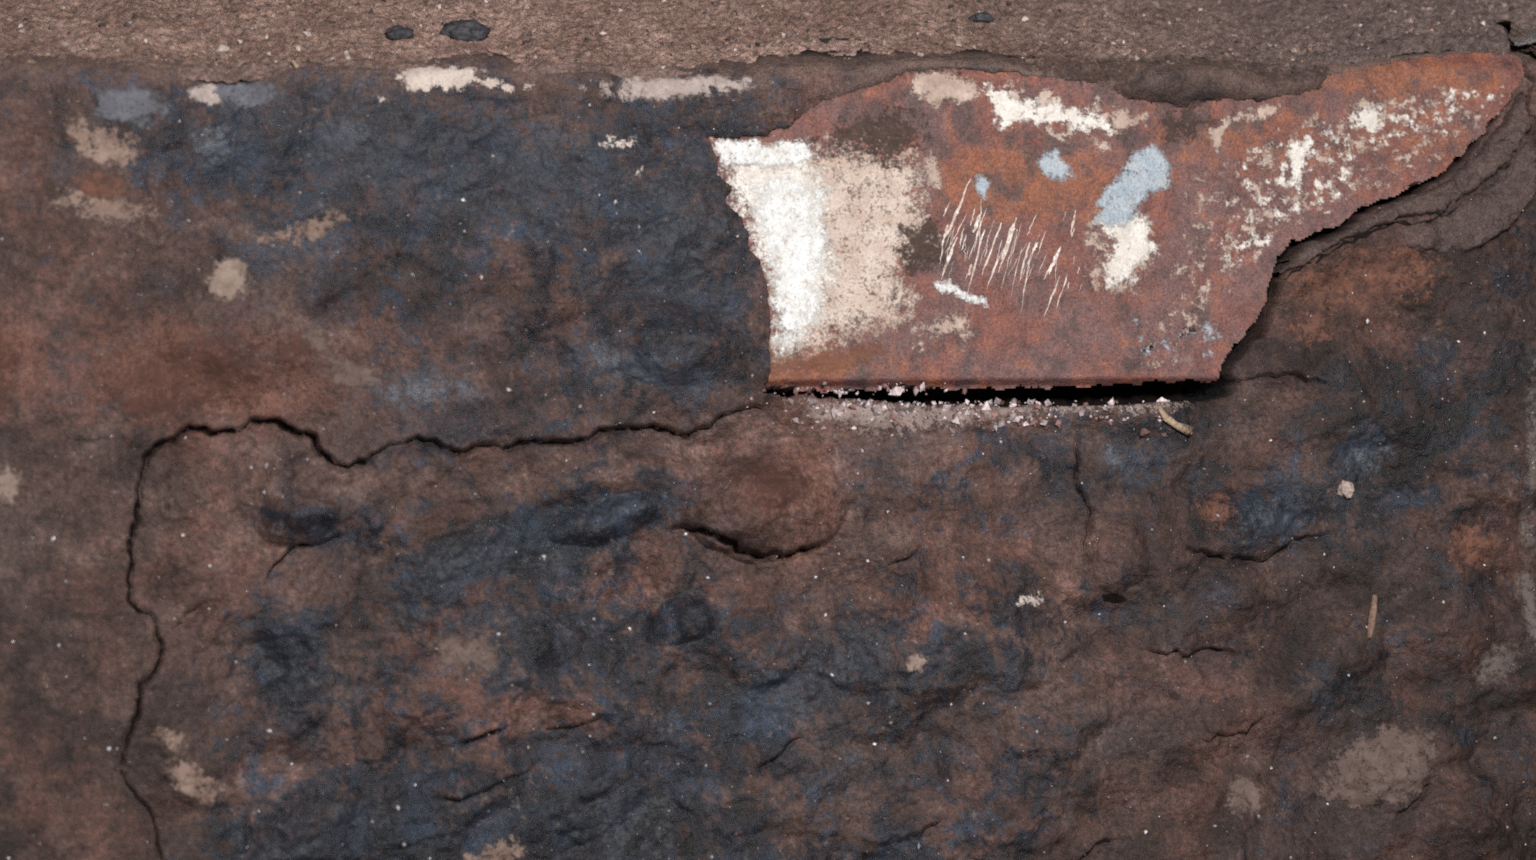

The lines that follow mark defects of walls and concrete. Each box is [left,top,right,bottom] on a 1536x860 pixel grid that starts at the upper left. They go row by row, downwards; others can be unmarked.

peeling [708,51,1524,393]
crack [1267,156,1462,297]
rust [1264,56,1536,349]
crack [72,343,1327,860]